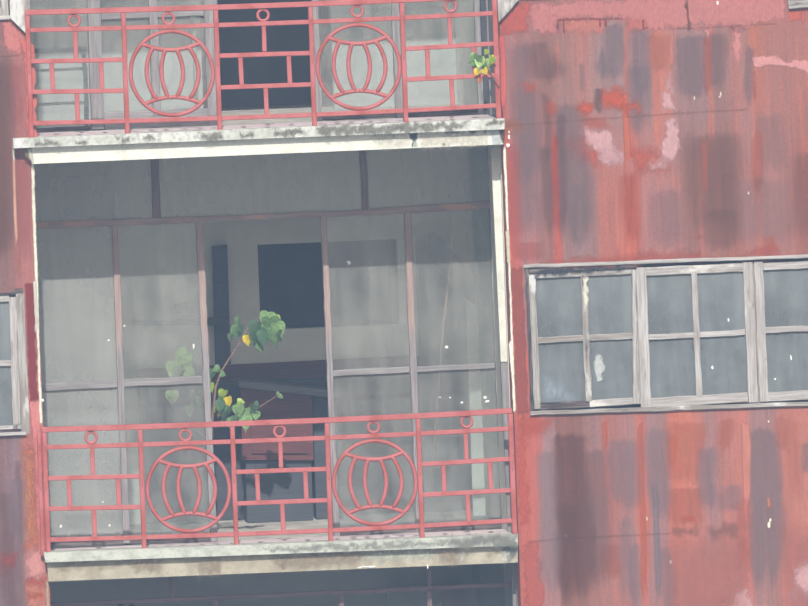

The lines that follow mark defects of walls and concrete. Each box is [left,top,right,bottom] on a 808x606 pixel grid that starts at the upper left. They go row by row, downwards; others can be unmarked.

peeling [498,0,786,62]
peeling [752,55,808,74]
water stain [317,119,503,146]
peeling [583,125,625,164]
peeling [652,92,680,168]
water stain [134,559,159,571]
water stain [274,532,517,569]
water stain [653,487,661,591]
peeling [793,564,808,599]